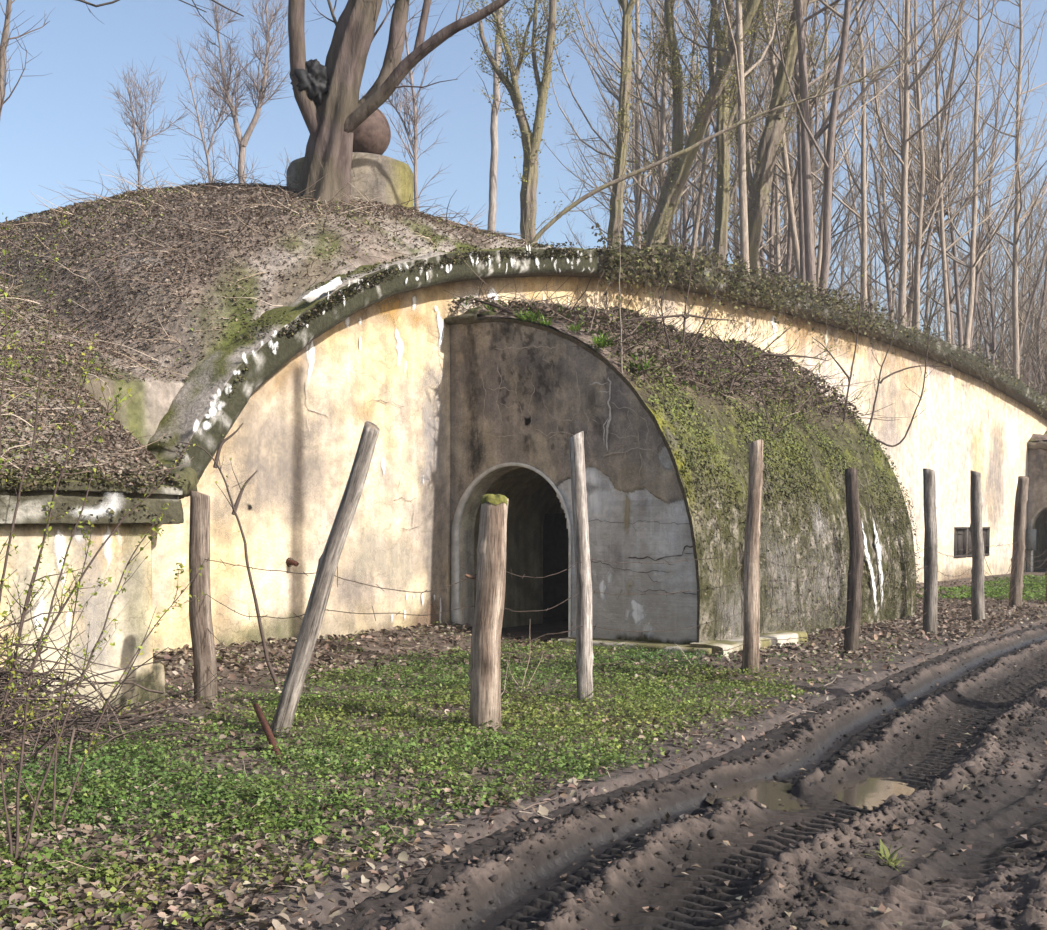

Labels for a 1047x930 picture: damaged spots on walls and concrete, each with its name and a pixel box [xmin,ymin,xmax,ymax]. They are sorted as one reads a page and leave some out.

leakage [467,325,481,475]
crack [481,345,664,479]
spalling [555,479,577,636]
spalling [585,468,697,643]
leakage [862,524,883,605]